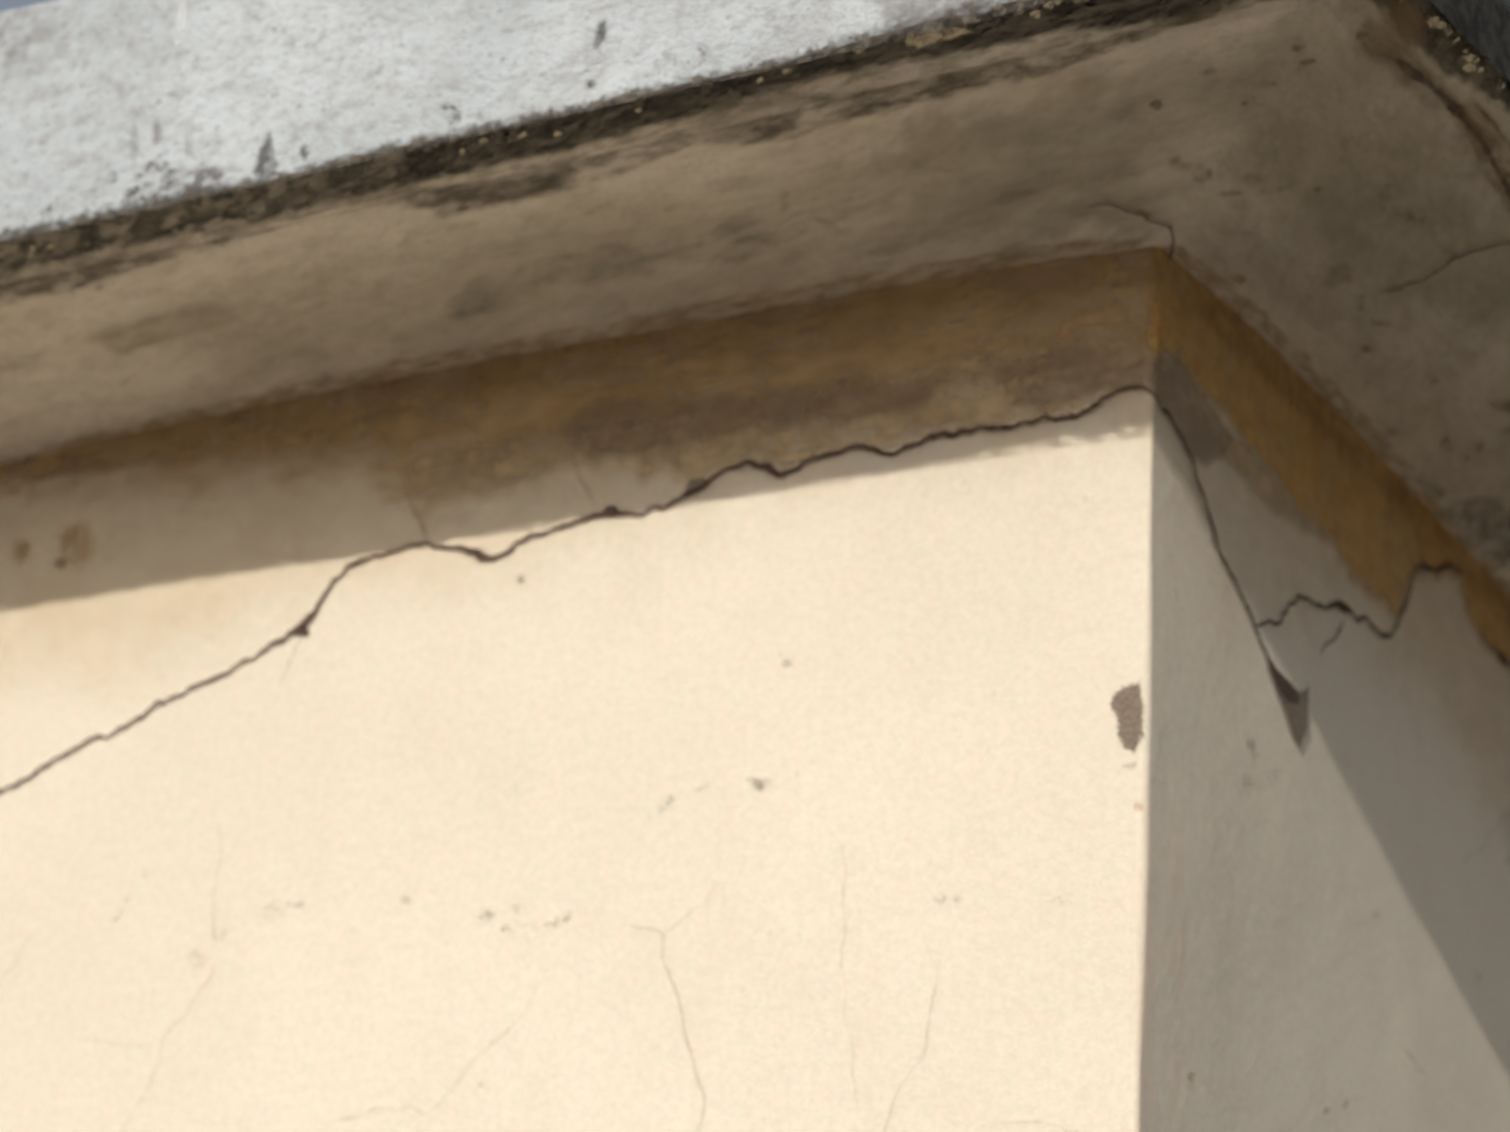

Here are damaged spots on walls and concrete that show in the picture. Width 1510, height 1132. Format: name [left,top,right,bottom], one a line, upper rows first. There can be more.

water stain [0,0,1238,295]
water stain [1372,0,1510,111]
crack [0,385,1464,793]
water stain [28,246,1510,660]
peeling [1110,683,1144,751]